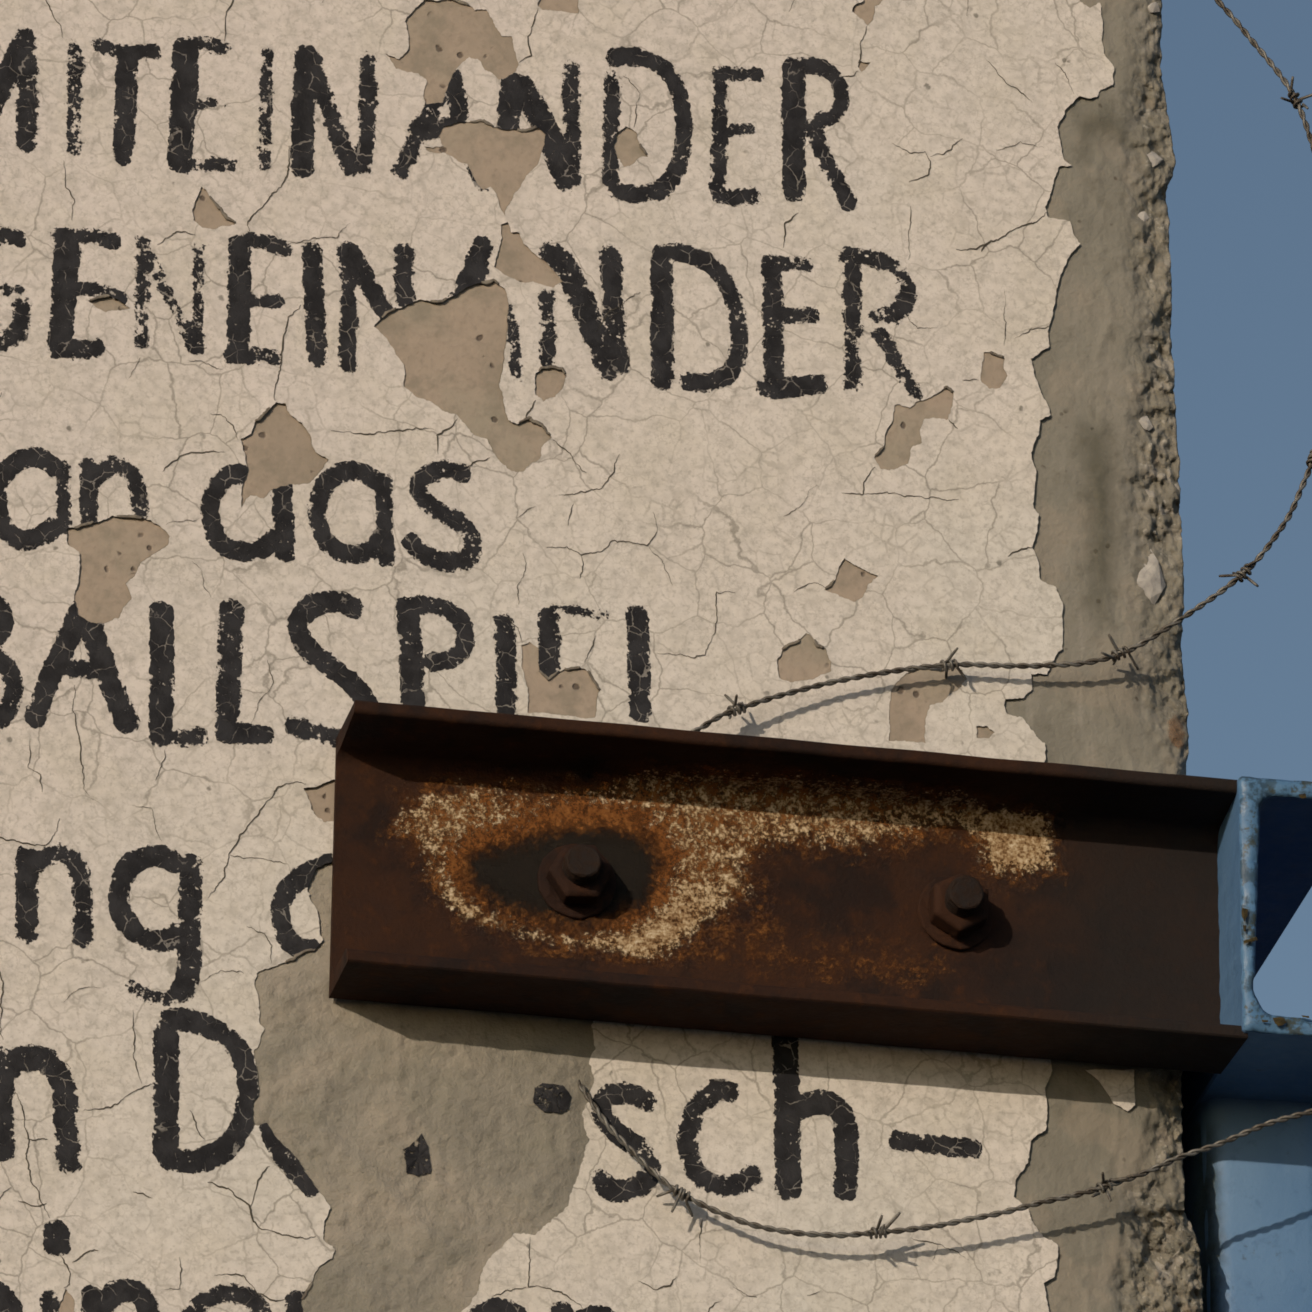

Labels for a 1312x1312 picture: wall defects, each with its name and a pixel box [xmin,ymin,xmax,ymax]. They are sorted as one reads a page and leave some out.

peeling [386,0,518,104]
peeling [374,119,566,472]
crack [956,214,1045,252]
spalling [1004,0,1189,775]
peeling [67,514,169,623]
crack [508,440,671,641]
crack [208,781,304,898]
corrosion [389,766,1055,959]
crack [0,1092,50,1218]
crack [208,1166,316,1239]
spalling [252,861,596,1312]
spalling [1014,1060,1203,1312]